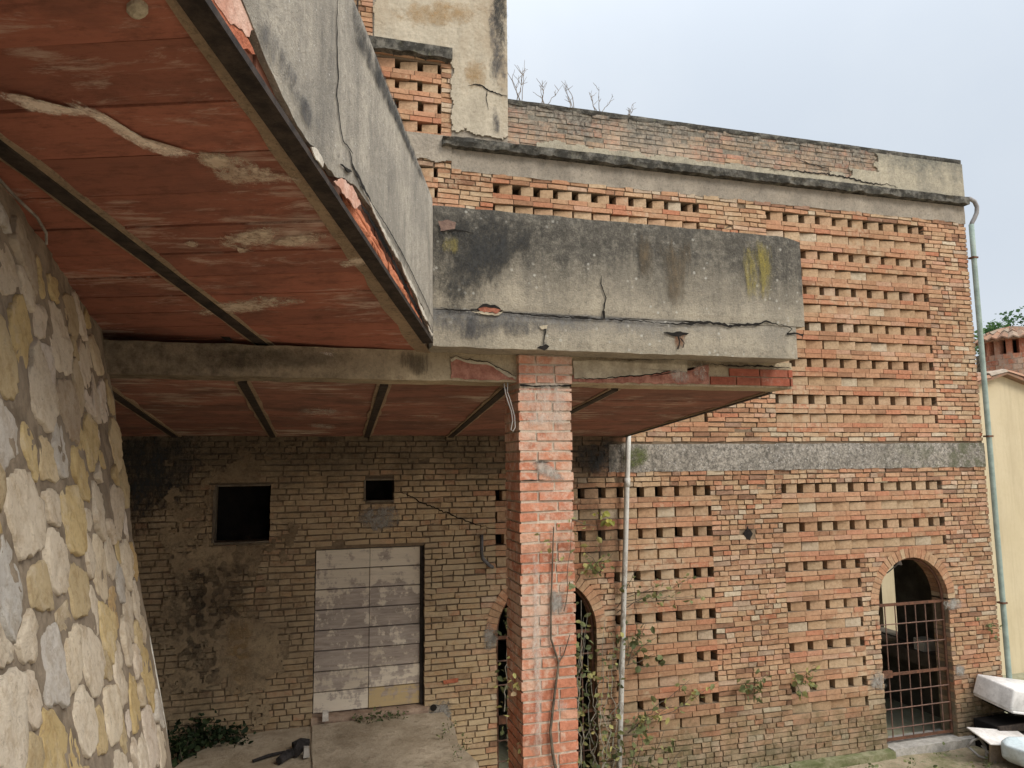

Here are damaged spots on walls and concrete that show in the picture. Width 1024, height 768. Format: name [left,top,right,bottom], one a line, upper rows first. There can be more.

spalling [212,0,255,54]
flaking render [310,147,324,168]
crack [336,0,803,350]
crack [769,156,898,188]
spalling [472,304,503,316]
flaking render [450,356,517,381]
flaking render [572,360,793,386]
damp [122,436,199,531]